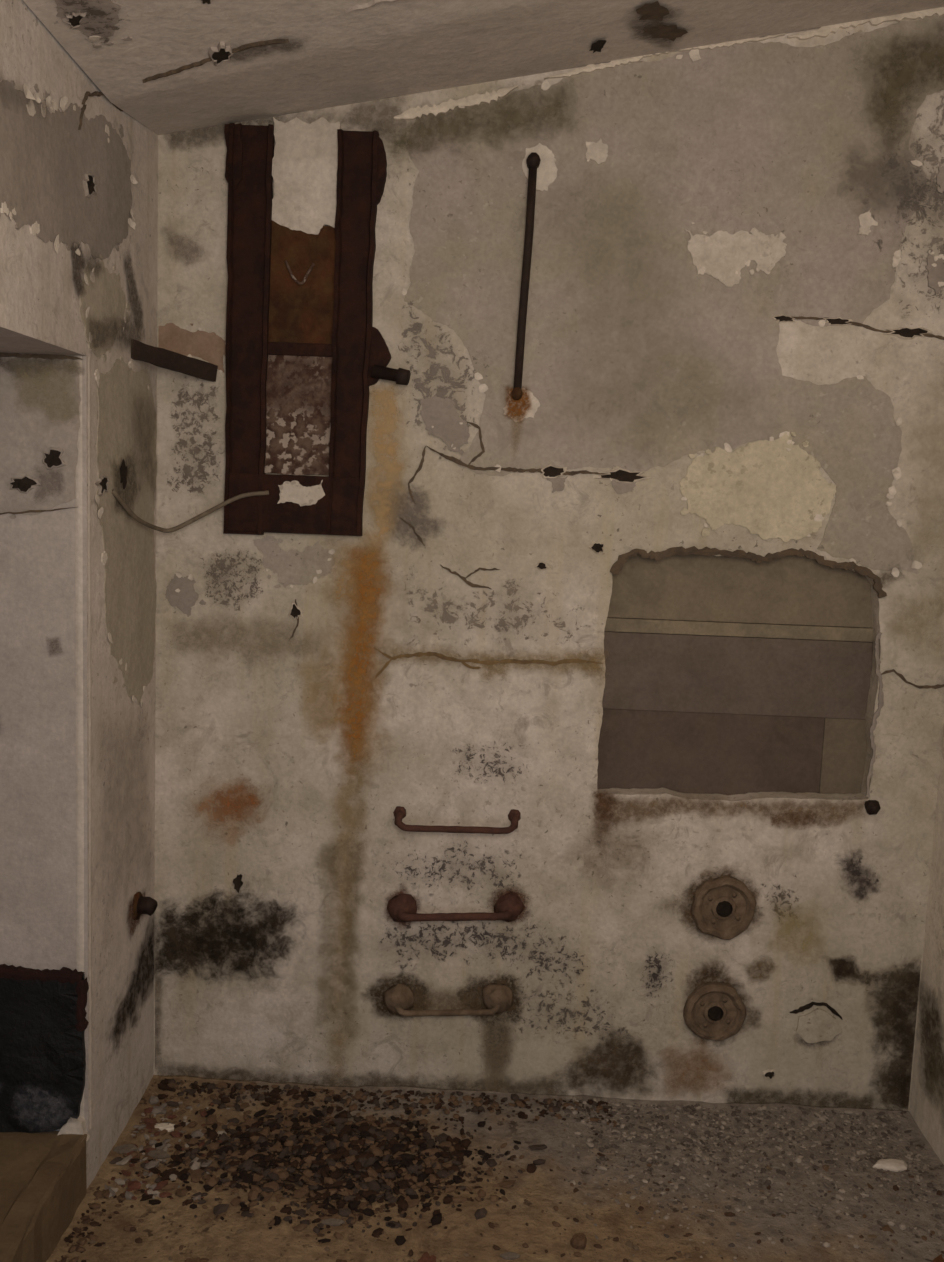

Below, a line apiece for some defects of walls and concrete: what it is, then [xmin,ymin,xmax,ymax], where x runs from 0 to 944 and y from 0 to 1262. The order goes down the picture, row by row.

spalling [55,0,132,49]
damp [872,29,944,140]
peeling [402,1,944,598]
crack [792,316,892,333]
crack [922,333,944,341]
peeling [0,80,206,706]
corrosion [506,388,531,420]
crack [400,422,604,589]
damp [114,895,293,1052]
crack [790,1002,842,1019]
damp [729,959,944,1109]